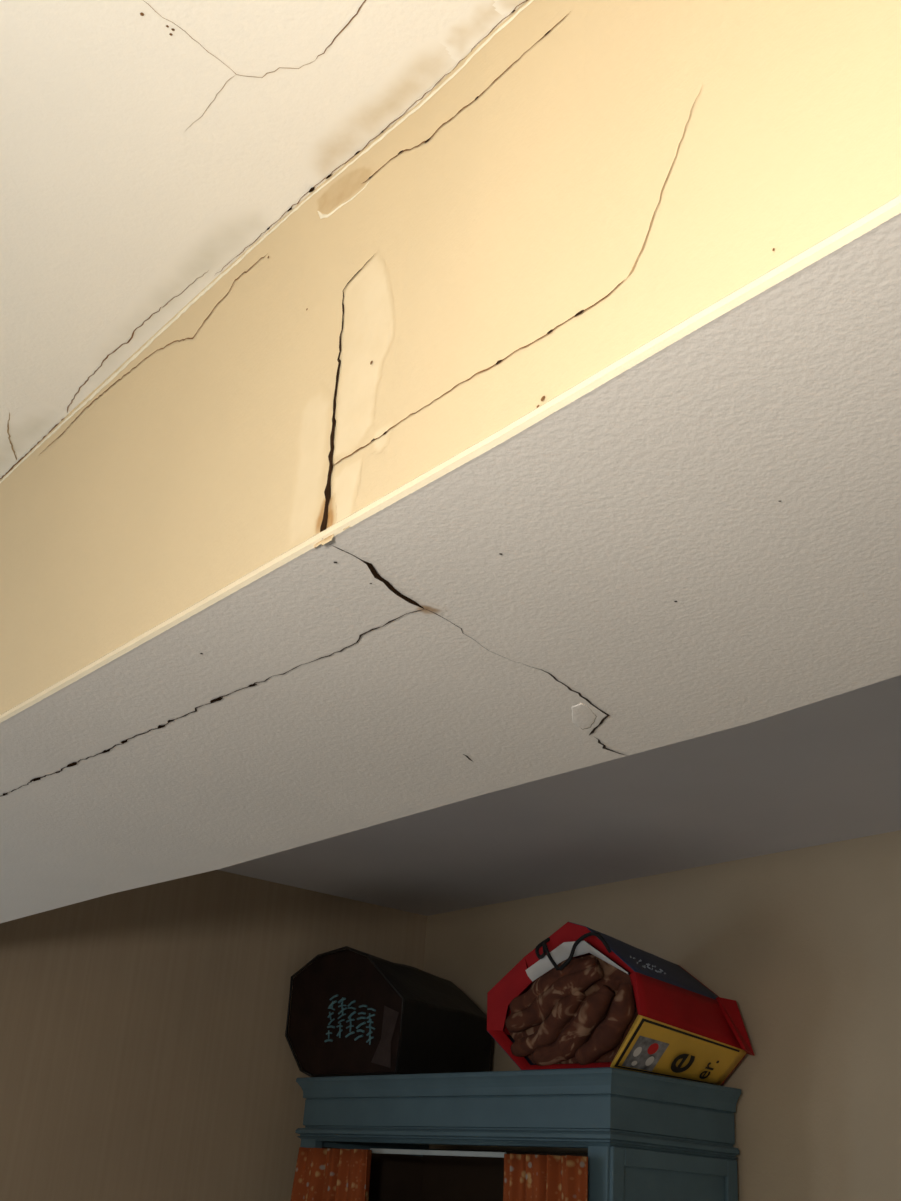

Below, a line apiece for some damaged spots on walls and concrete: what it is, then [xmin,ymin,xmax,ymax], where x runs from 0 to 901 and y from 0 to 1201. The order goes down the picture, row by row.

crack [0,0,571,479]
crack [2,87,702,796]